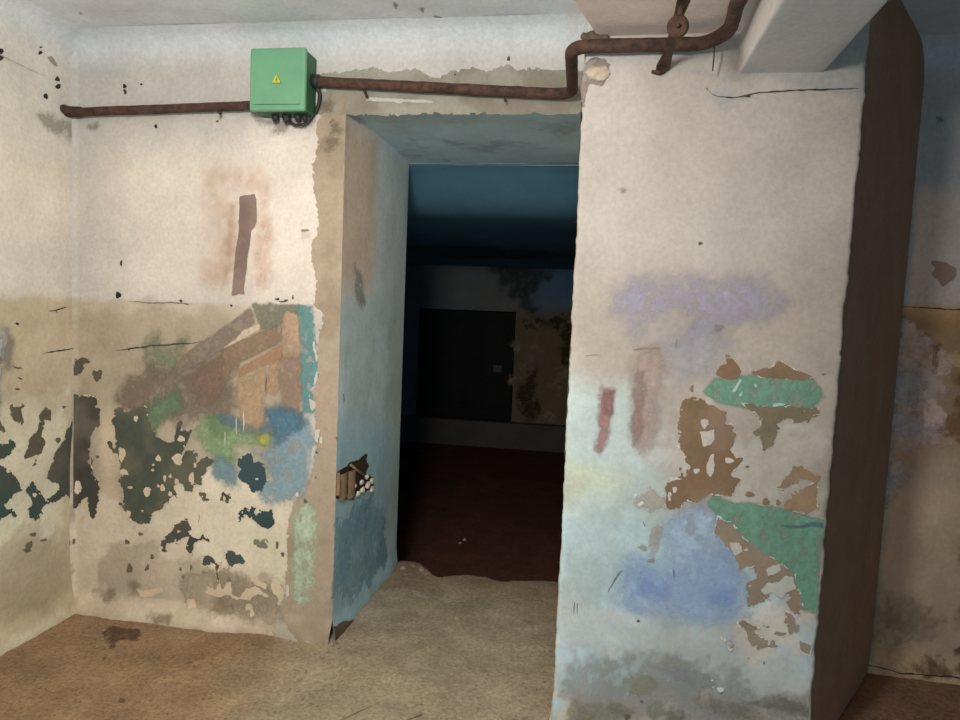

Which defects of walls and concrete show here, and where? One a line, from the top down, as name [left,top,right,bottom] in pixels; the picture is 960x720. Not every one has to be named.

crack [706,88,858,98]
flaking render [931,260,957,287]
crack [123,341,200,350]
peeling [126,56,610,645]
peeling [73,357,103,382]
peeling [716,355,825,381]
peeling [634,385,821,516]
peeling [0,394,231,553]
peeling [713,515,812,657]
leakage [870,602,960,679]
crack [869,665,960,679]